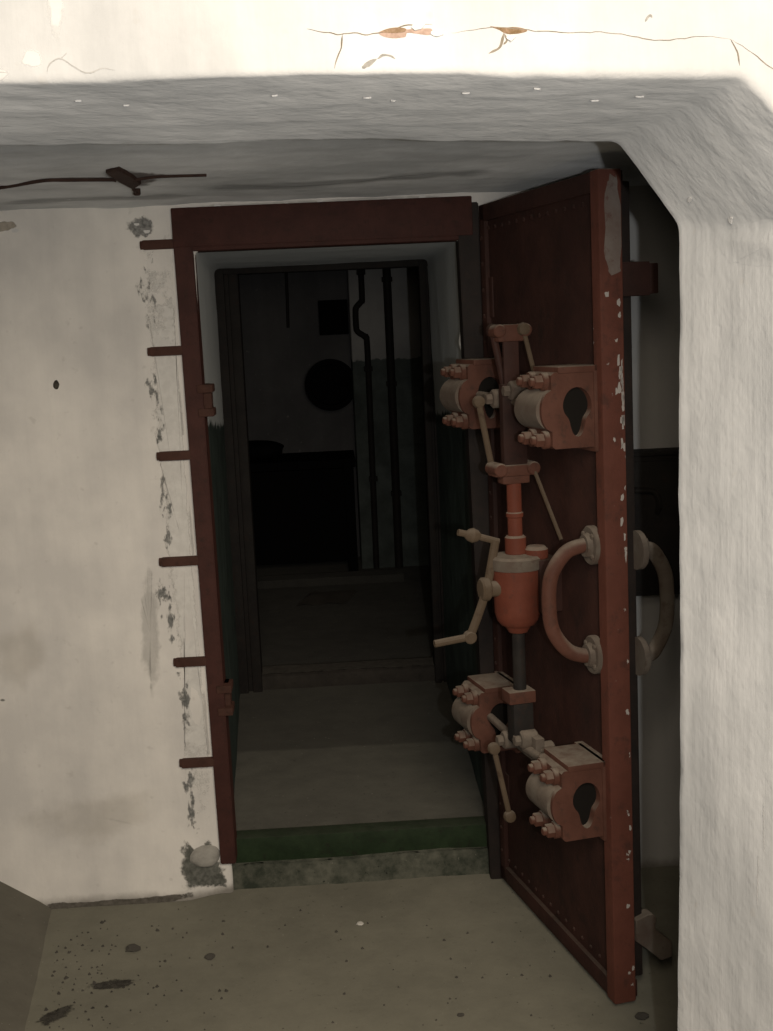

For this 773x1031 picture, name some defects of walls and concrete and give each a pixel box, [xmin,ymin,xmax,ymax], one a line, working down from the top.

crack [310,24,432,69]
crack [457,27,773,69]
peeling [129,216,152,237]
peeling [138,269,208,757]
peeling [183,772,204,828]